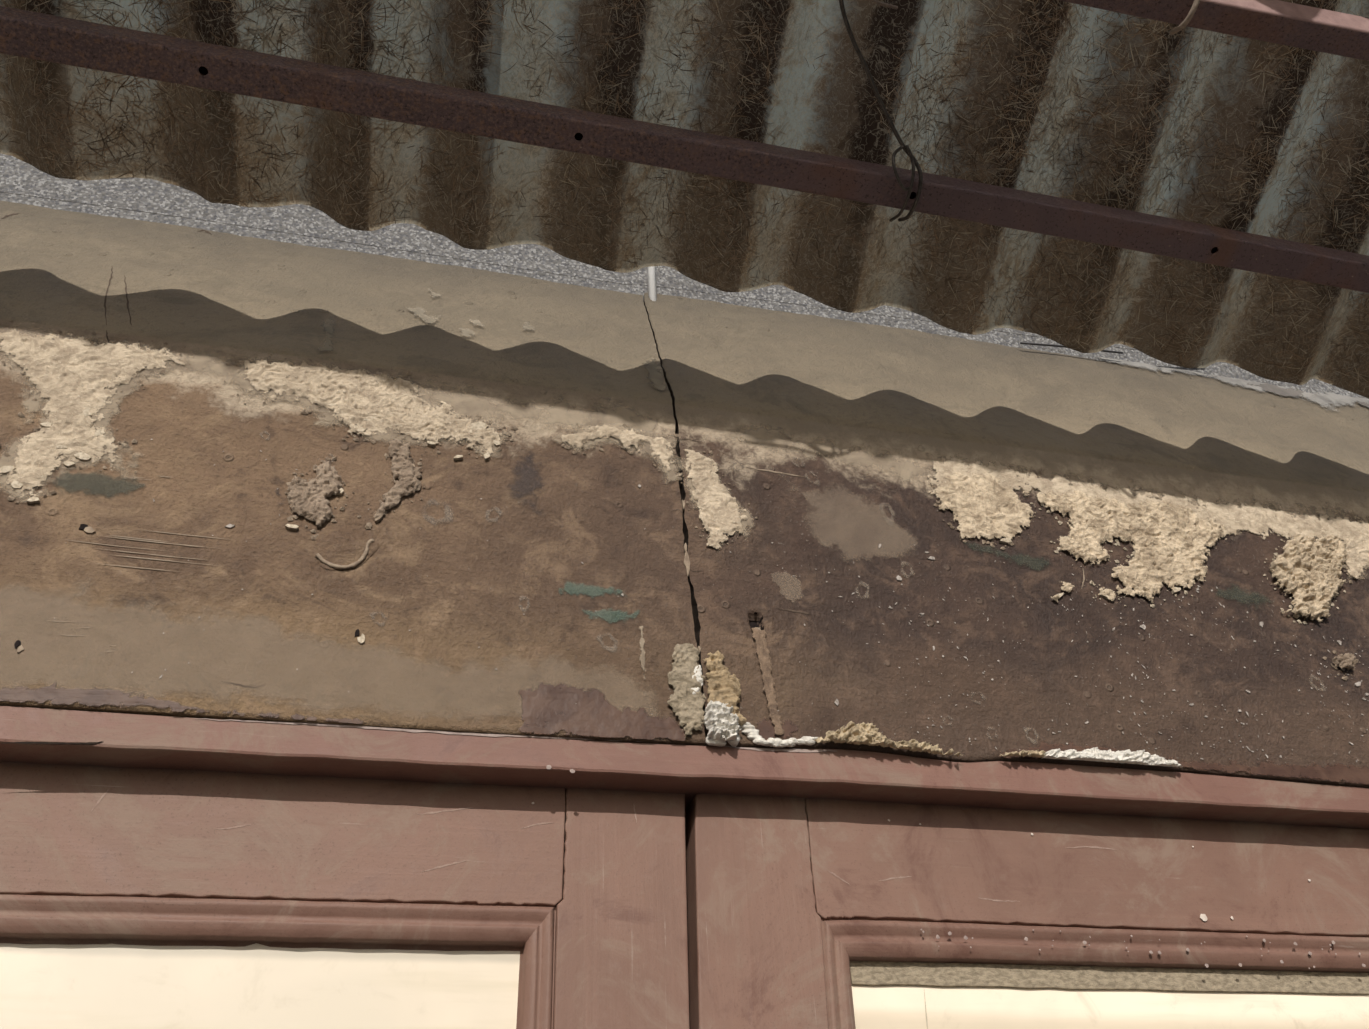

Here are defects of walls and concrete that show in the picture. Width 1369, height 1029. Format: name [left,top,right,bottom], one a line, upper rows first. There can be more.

peeling [79,524,95,534]
peeling [0,320,191,504]
peeling [224,354,518,540]
peeling [554,423,758,549]
crack [643,301,708,746]
spalling [927,455,1369,624]
spalling [203,718,619,741]
corrosion [749,612,784,735]
spalling [722,721,963,757]
spalling [1000,749,1045,758]
spalling [1323,650,1362,680]